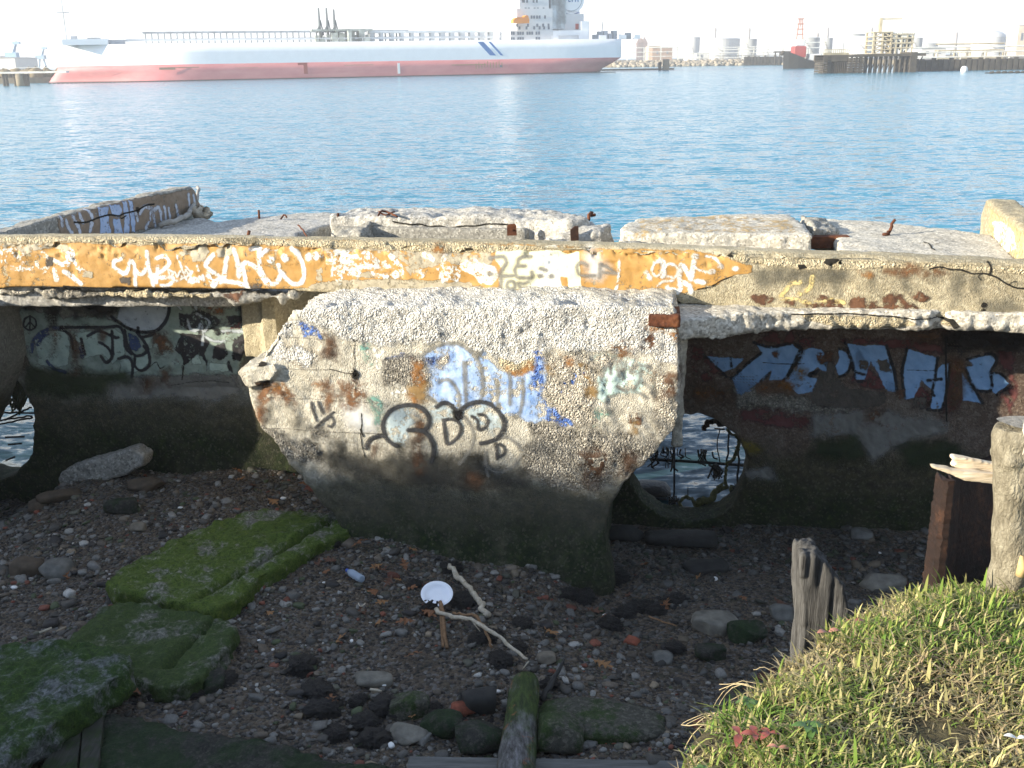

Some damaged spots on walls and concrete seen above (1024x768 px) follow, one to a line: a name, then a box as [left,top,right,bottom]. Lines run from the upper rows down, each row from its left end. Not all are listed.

corrosion [751,291,930,309]
spalling [0,224,681,491]
damp [25,365,130,399]
spalling [701,418,725,431]
damp [323,440,530,492]
damp [899,440,962,469]